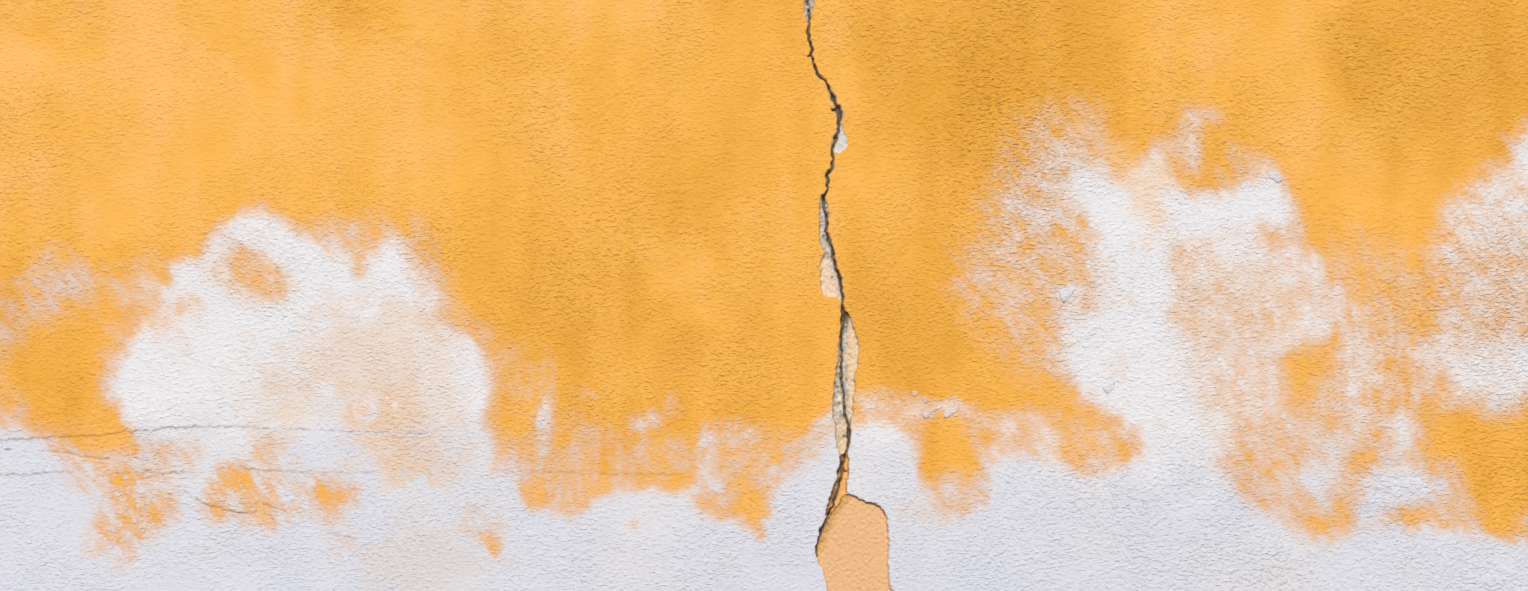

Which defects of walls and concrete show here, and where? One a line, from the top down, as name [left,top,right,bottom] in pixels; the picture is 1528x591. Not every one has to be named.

peeling [0,194,894,591]
crack [806,0,851,558]
peeling [830,78,1528,591]